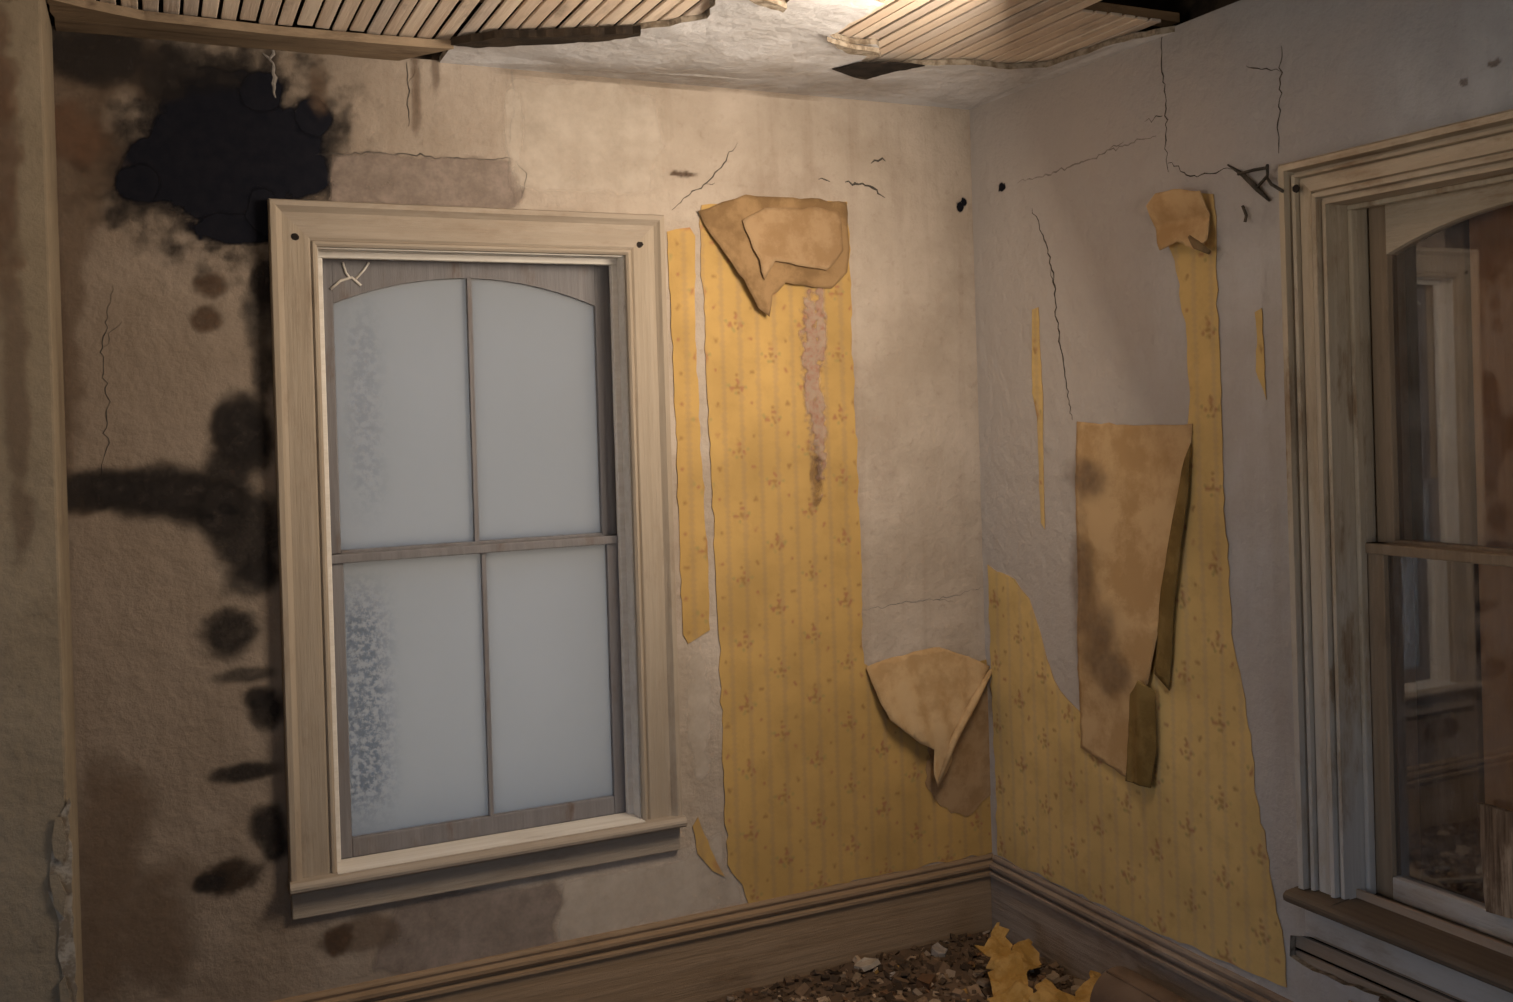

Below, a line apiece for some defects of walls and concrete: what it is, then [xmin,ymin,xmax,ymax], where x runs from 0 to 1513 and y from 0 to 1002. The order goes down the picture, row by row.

spalling [95,0,713,48]
spalling [749,0,787,13]
spalling [827,0,1161,80]
crack [1019,38,1230,415]
damp [51,24,350,594]
damp [205,609,283,727]
damp [212,763,273,782]
mould [195,806,288,894]
spalling [1356,889,1513,957]
spalling [1295,936,1467,1002]